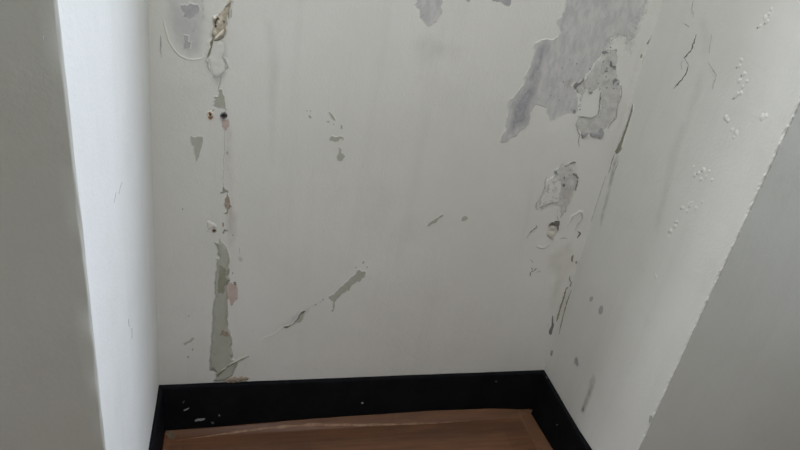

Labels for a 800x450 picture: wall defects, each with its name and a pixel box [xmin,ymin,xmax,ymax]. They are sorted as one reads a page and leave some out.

flaking render [210,0,234,41]
peeling [414,0,444,27]
crack [673,0,717,89]
peeling [499,0,646,147]
peeling [190,135,204,162]
peeling [614,103,634,155]
flaking render [536,161,579,240]
peeling [209,186,250,383]
peeling [315,261,368,312]